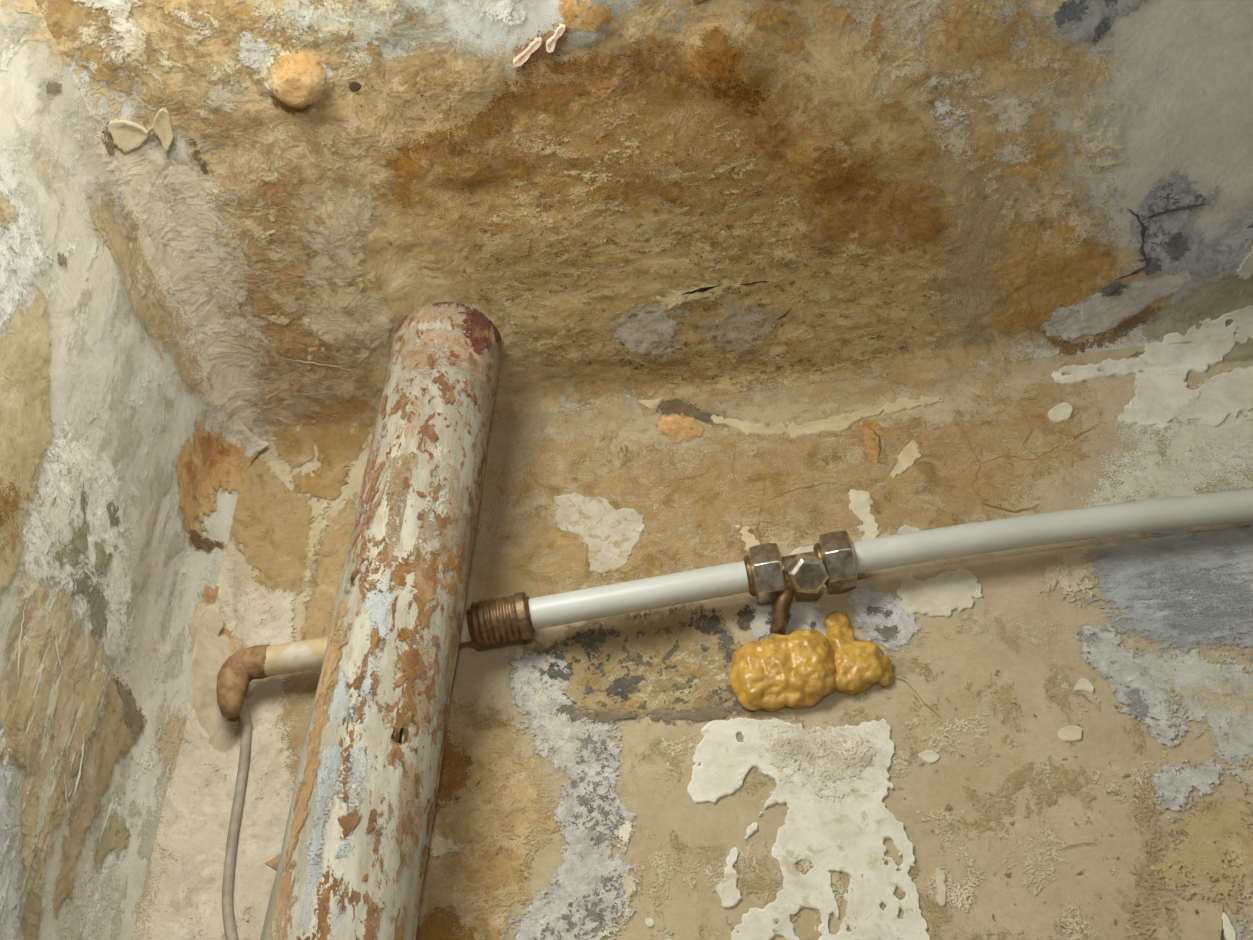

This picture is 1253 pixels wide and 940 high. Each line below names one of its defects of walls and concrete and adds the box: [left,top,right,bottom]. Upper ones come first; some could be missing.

damp [0,0,1253,601]
damp [78,738,181,940]
damp [105,456,198,744]
rust [197,585,249,654]
rust [270,302,564,940]
peeling [500,521,1253,940]